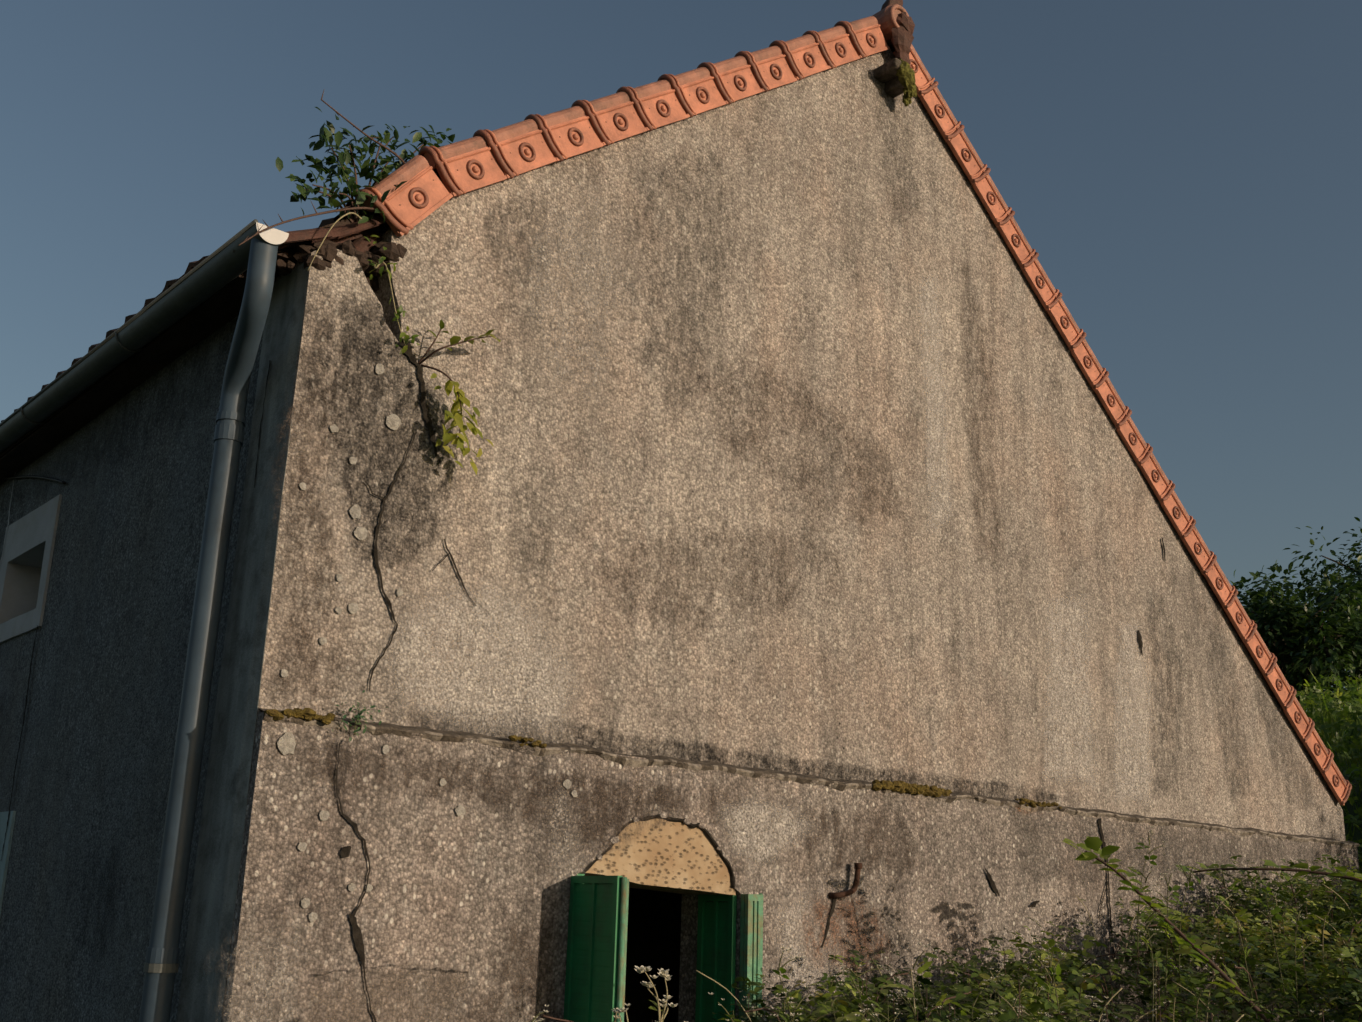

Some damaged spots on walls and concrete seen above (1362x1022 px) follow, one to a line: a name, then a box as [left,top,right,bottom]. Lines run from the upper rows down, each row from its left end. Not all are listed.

leakage [276,301,451,698]
crack [365,338,437,692]
leakage [643,163,734,403]
leakage [919,278,950,528]
crack [336,743,377,1022]
leakage [300,746,685,851]
leakage [411,710,1054,802]
leakage [757,804,918,874]
leakage [1045,598,1093,782]